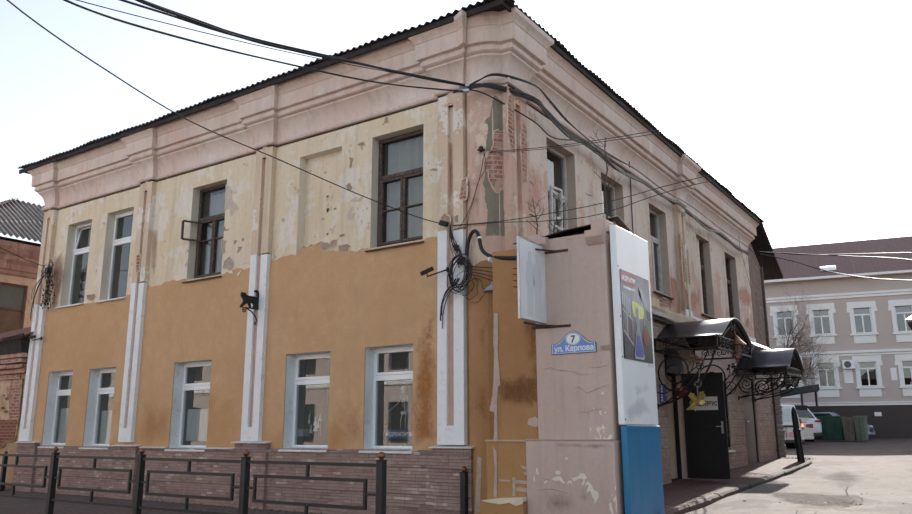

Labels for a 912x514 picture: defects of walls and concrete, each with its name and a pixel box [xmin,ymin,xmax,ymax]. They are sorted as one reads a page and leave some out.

flaking render [224,184,239,217]
flaking render [483,129,505,236]
flaking render [221,225,250,277]
flaking render [294,232,352,255]
peeling [499,468,599,504]